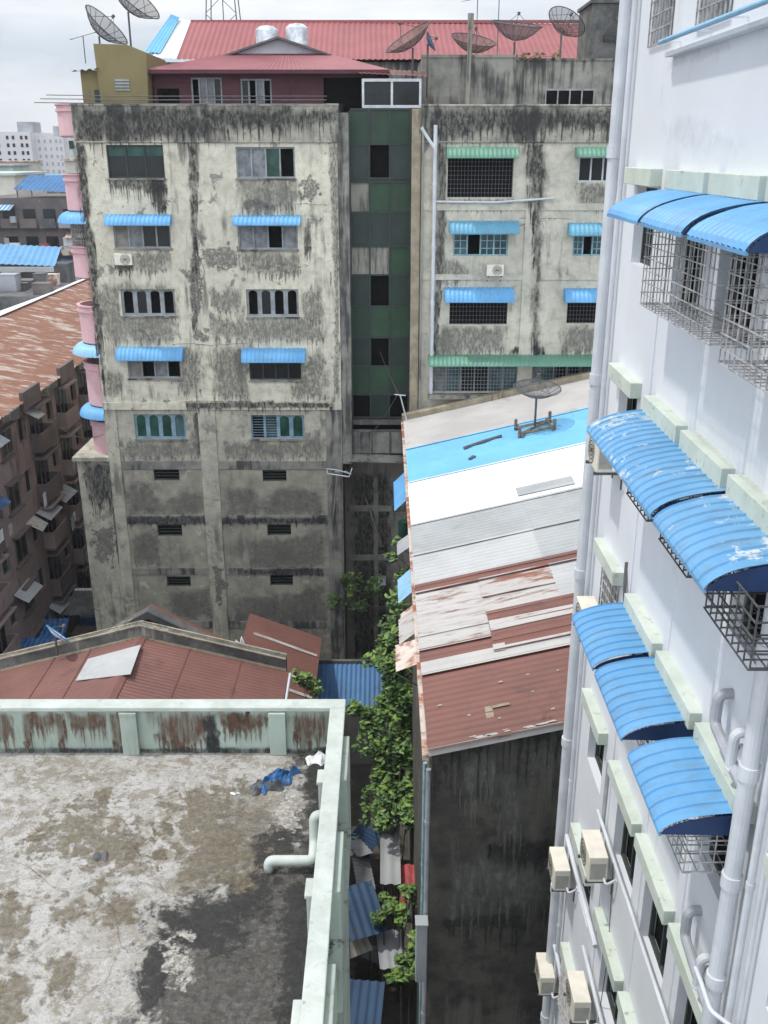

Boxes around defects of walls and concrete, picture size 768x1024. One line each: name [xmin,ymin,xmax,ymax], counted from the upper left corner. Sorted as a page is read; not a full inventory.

leakage [73,106,341,461]
leakage [426,107,611,355]
leakage [84,463,205,564]
leakage [222,490,326,621]
corrosion [1,713,123,753]
corrosion [158,712,268,753]
corrosion [286,715,327,751]
leakage [110,747,326,1024]
leakage [430,731,560,955]